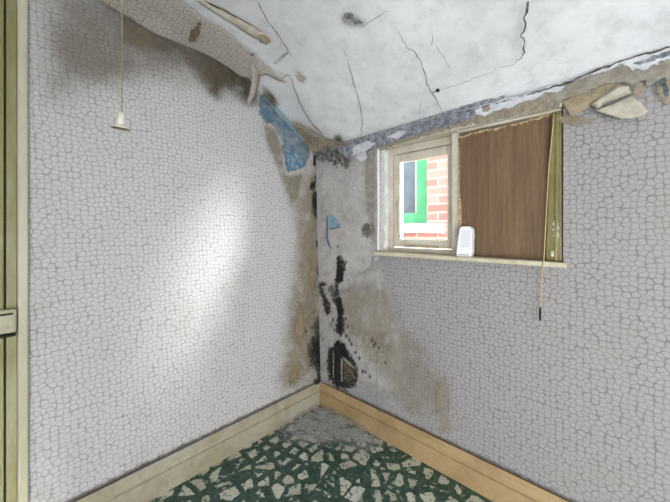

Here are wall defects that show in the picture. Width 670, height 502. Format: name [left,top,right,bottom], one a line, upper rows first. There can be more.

leakage [126,22,252,98]
crack [258,3,292,57]
peeling [259,95,310,172]
crack [280,72,339,147]
crack [344,52,363,139]
flaking render [352,59,670,155]
peeling [326,215,340,249]
leakage [266,122,404,393]